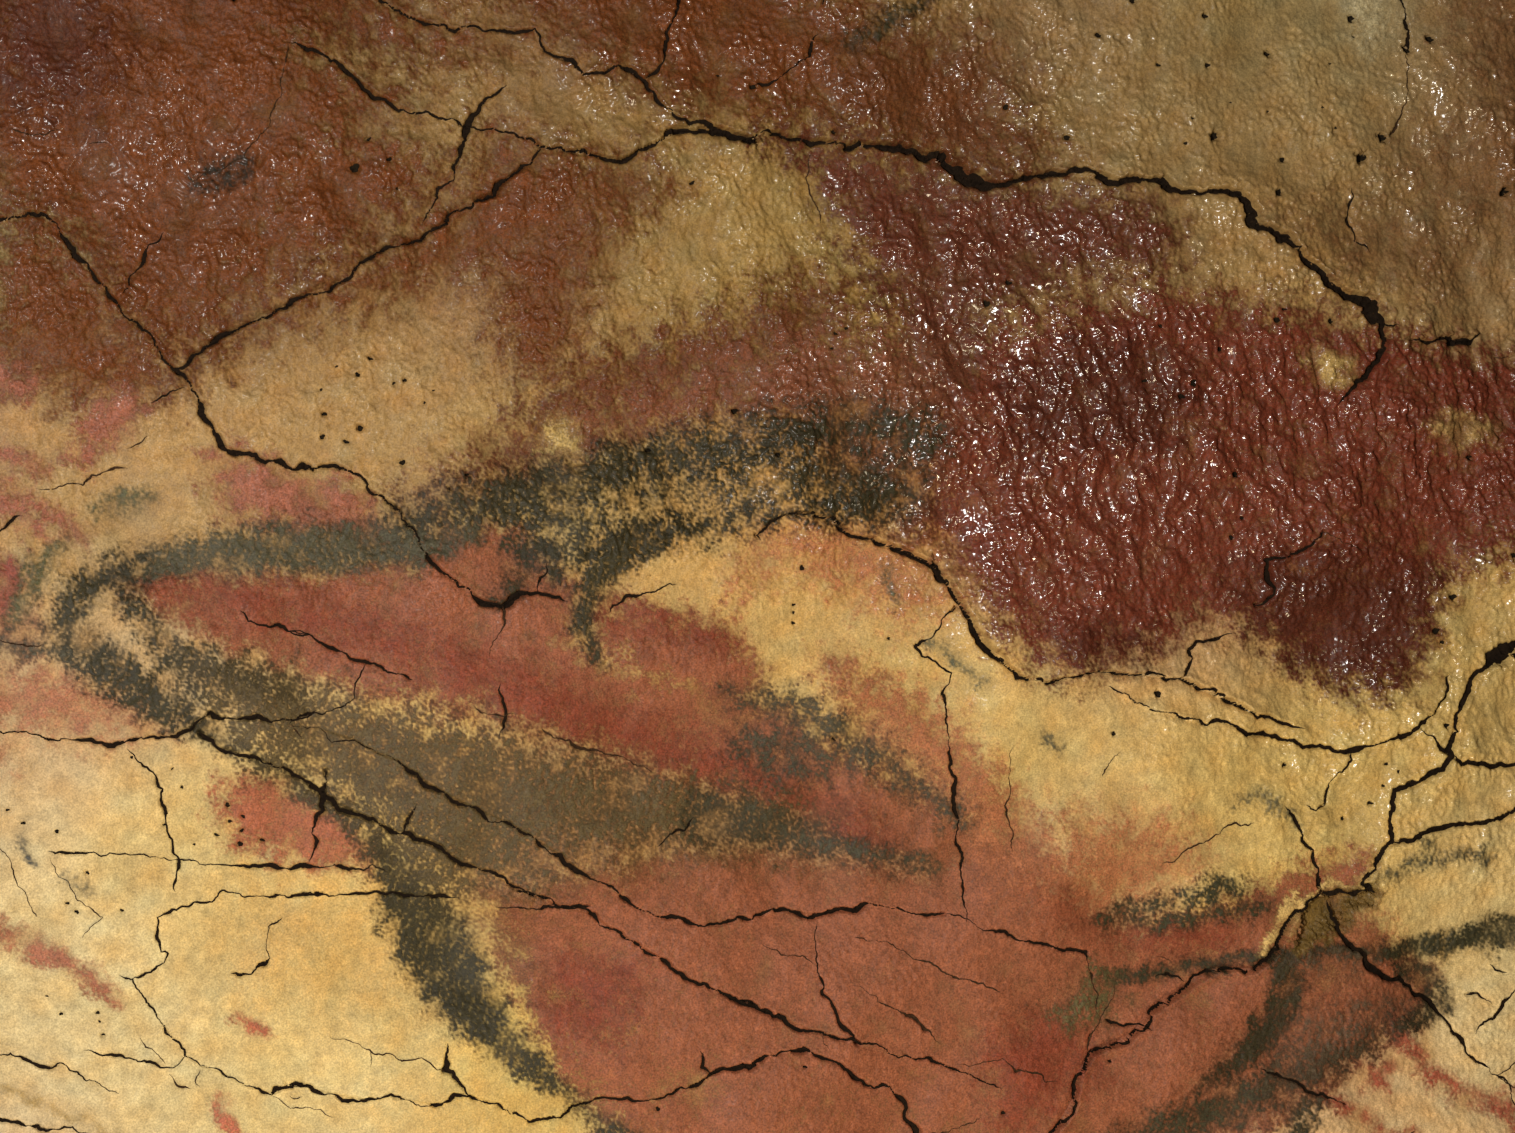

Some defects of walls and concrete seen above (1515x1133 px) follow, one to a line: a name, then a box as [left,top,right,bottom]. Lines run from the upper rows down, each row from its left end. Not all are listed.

crack [0,0,1510,773]
crack [0,511,1515,1133]